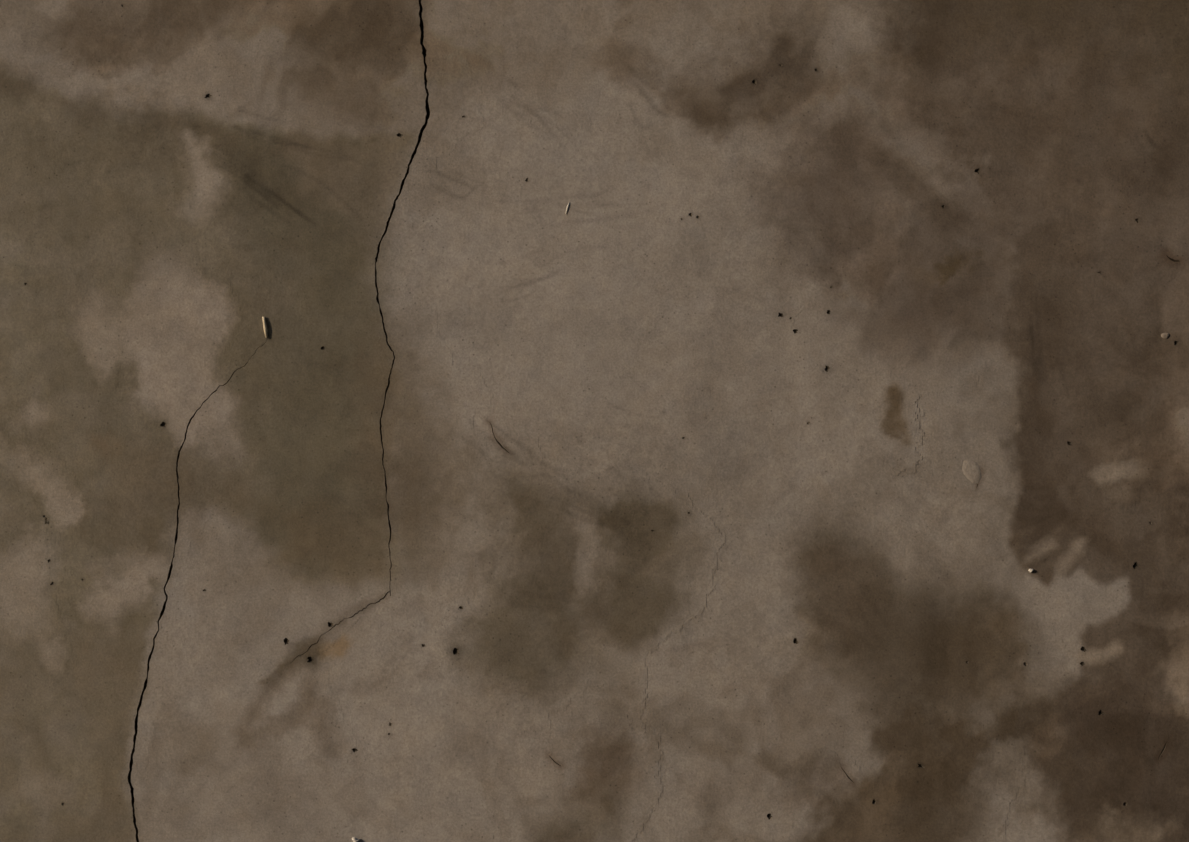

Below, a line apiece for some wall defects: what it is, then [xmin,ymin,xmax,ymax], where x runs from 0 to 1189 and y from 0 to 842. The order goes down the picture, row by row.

crack [128,342,266,842]
crack [291,0,430,663]
water stain [0,0,726,842]
water stain [577,0,1189,842]